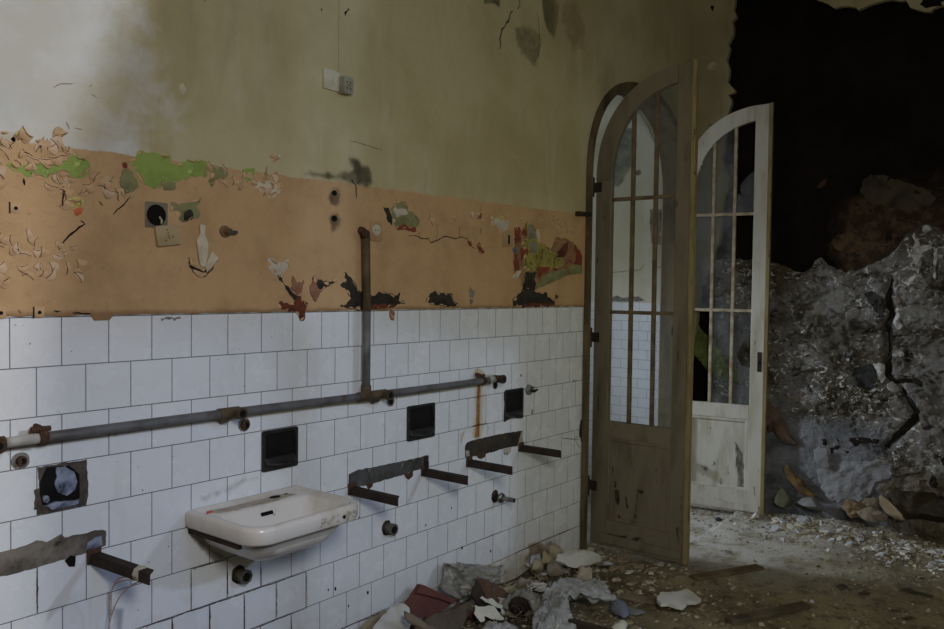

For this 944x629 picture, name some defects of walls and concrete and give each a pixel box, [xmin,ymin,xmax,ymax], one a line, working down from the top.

crack [499,0,540,61]
peeling [0,126,283,278]
leakage [343,159,370,185]
peeling [268,258,405,321]
crack [411,227,481,249]
peeling [426,287,476,307]
peeling [479,214,582,308]
flaking render [693,122,756,405]
flaking render [728,0,944,544]
rust [472,385,487,437]
hole [40,465,80,506]
spalling [0,530,106,576]